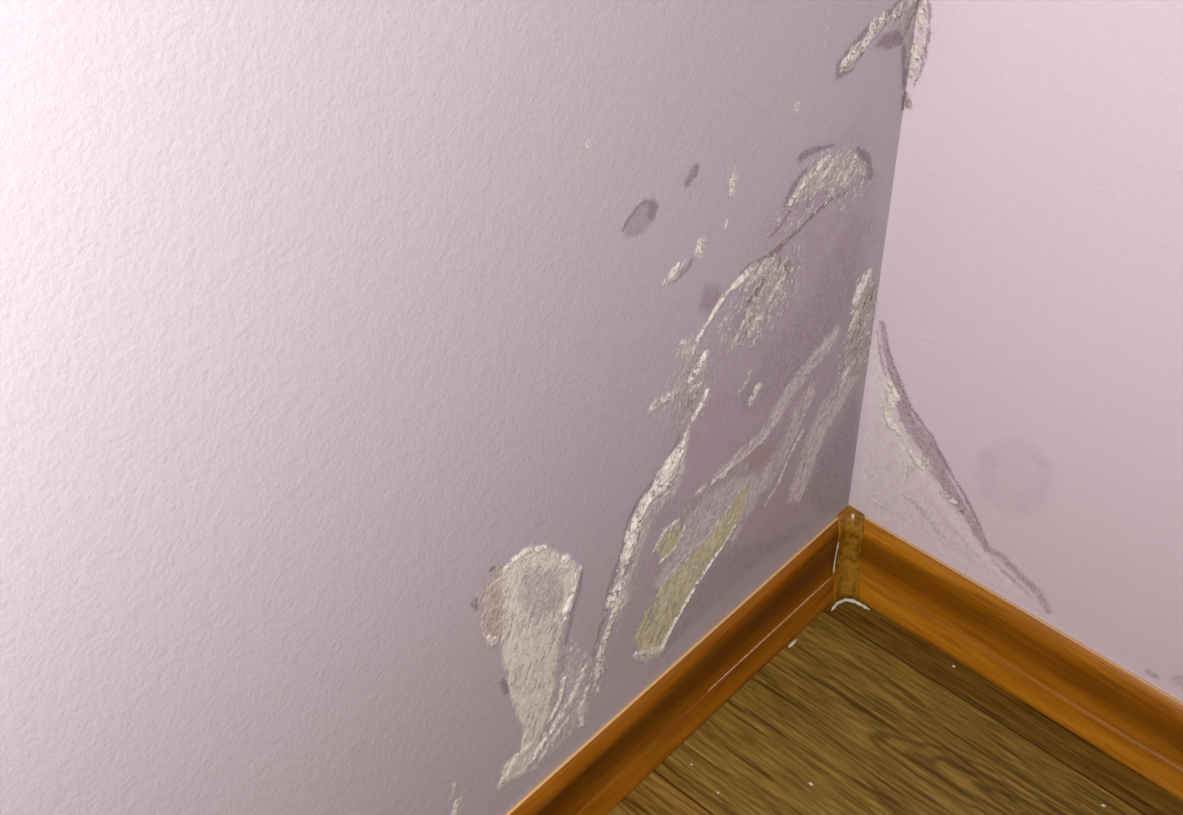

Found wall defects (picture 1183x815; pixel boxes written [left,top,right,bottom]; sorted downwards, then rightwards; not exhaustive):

peeling [835,0,932,110]
flaking render [471,141,1052,790]